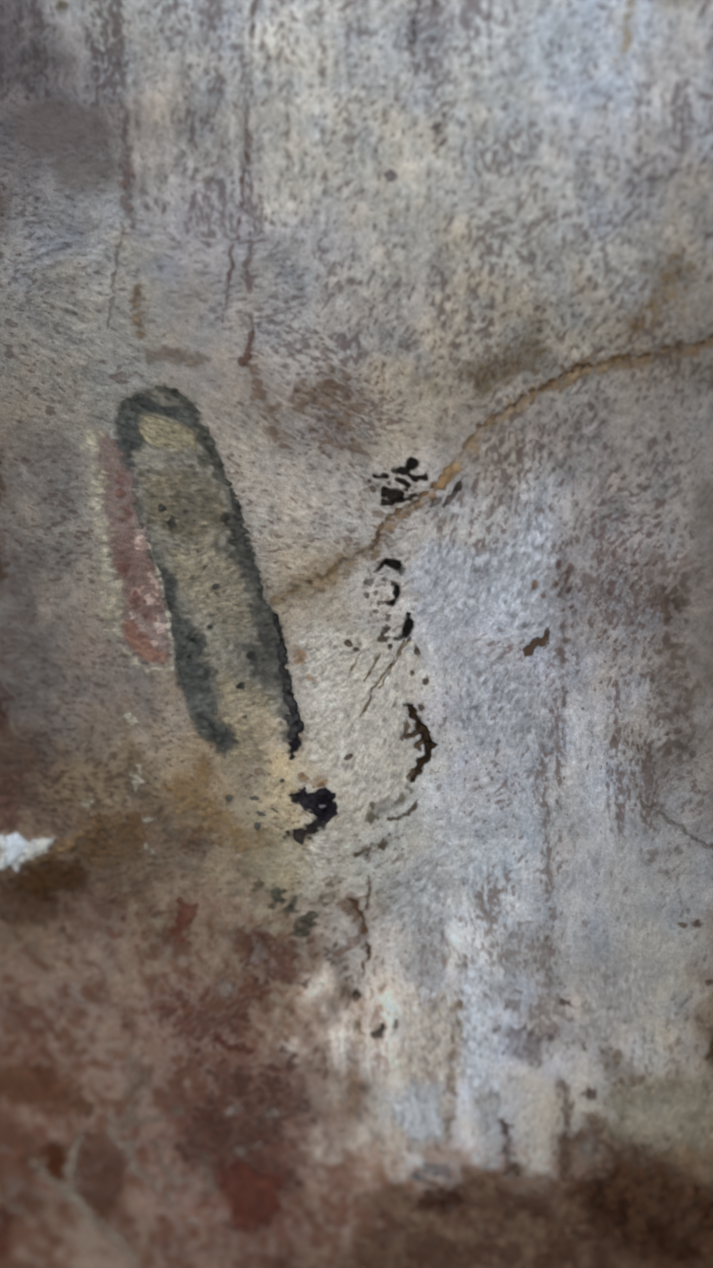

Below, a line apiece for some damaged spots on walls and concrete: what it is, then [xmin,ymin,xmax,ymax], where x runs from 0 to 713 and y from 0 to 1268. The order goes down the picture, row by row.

crack [372,335,713,549]
spalling [368,458,428,506]
spalling [429,482,461,508]
spalling [377,559,402,606]
spalling [378,613,420,655]